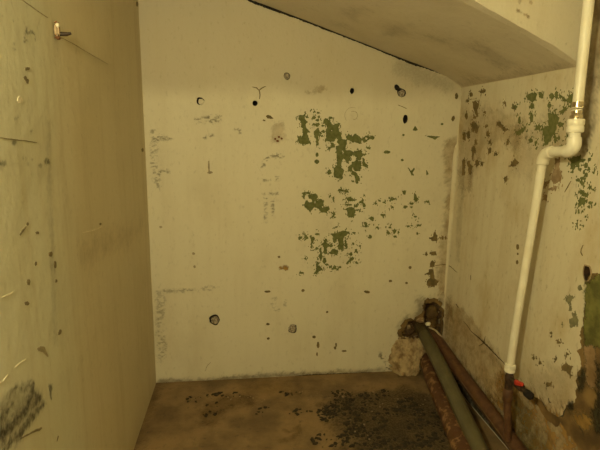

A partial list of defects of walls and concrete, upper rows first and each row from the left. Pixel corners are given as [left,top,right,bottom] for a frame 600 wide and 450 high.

peeling [462,86,499,175]
peeling [496,88,573,150]
peeling [295,109,431,276]
peeling [542,149,598,231]
peeling [423,251,439,288]
spalling [397,298,444,340]
peeling [534,273,600,450]
leakage [0,382,41,450]